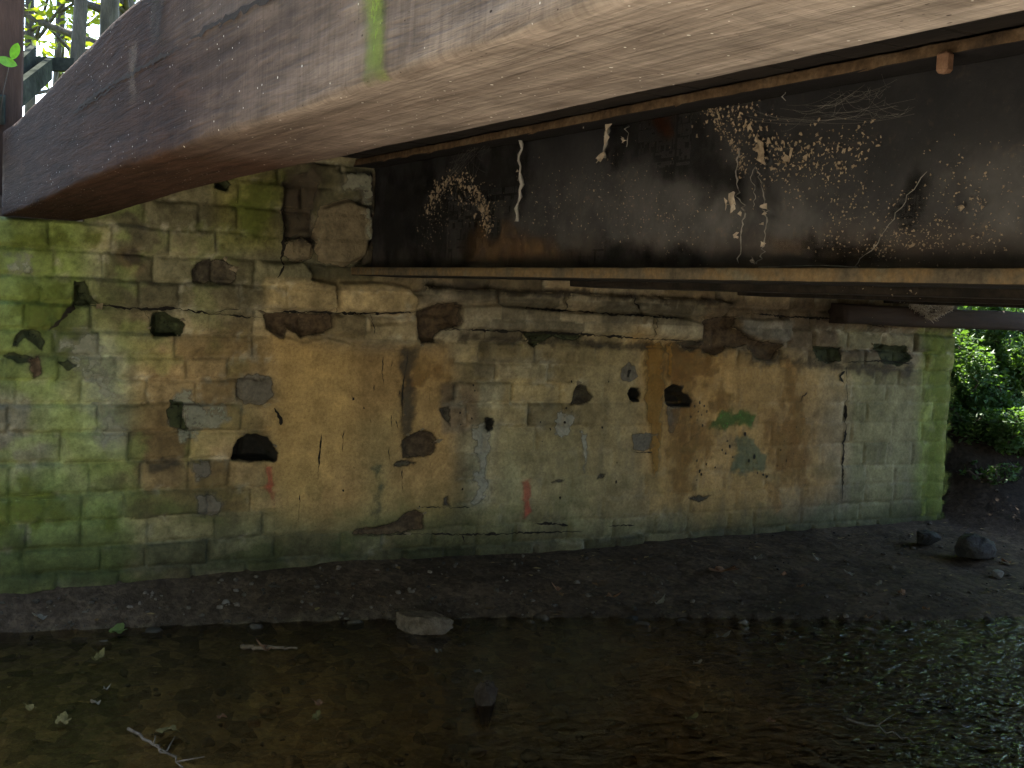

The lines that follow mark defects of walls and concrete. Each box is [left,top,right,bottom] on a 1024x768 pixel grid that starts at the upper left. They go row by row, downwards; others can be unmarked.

peeling [417,167,507,246]
peeling [685,100,1024,268]
spalling [192,257,239,285]
crack [49,296,413,334]
spalling [257,310,333,340]
spalling [677,316,784,361]
crack [747,312,830,320]
spalling [871,342,912,366]
damp [399,348,419,451]
spalling [394,428,443,467]
corrosion [644,341,673,476]
crack [839,360,913,499]